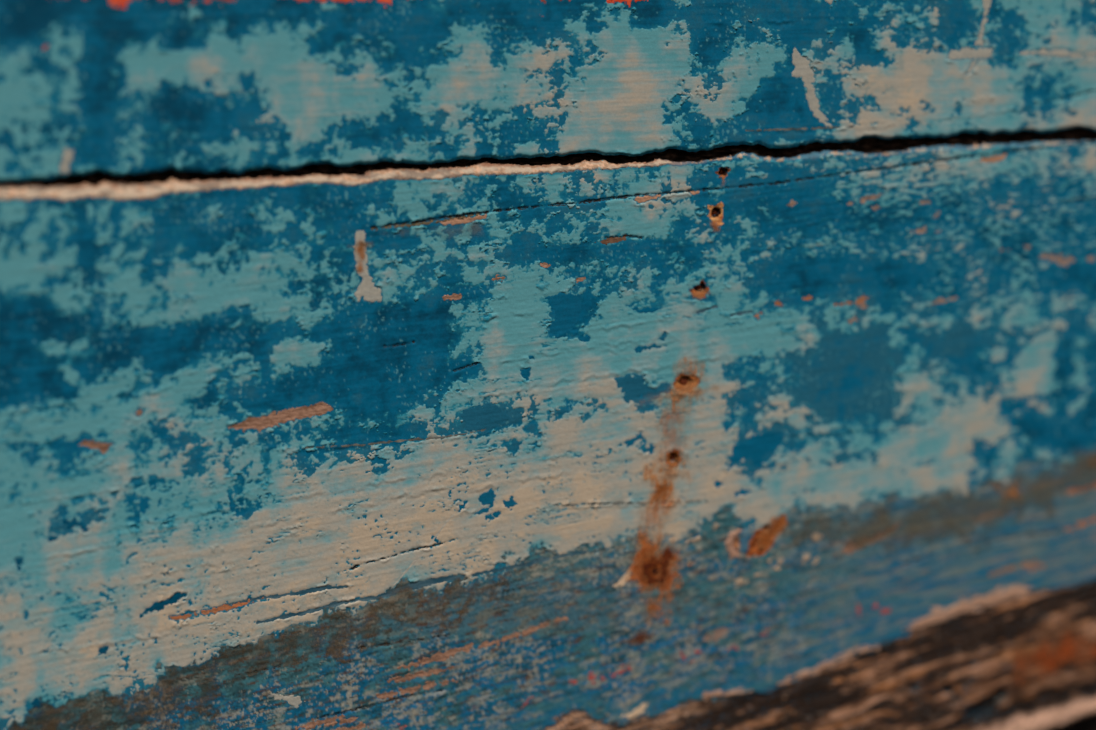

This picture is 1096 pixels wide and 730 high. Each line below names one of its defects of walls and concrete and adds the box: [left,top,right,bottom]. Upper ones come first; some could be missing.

peeling [115,2,789,171]
peeling [800,0,1096,142]
peeling [70,118,152,175]
crack [745,125,854,133]
crack [371,141,1096,231]
peeling [810,140,1096,249]
peeling [890,207,976,294]
corrosion [644,449,685,517]
corrosion [759,515,785,547]
corrosion [630,538,680,611]
peeling [902,585,1033,631]
peeling [777,645,879,686]